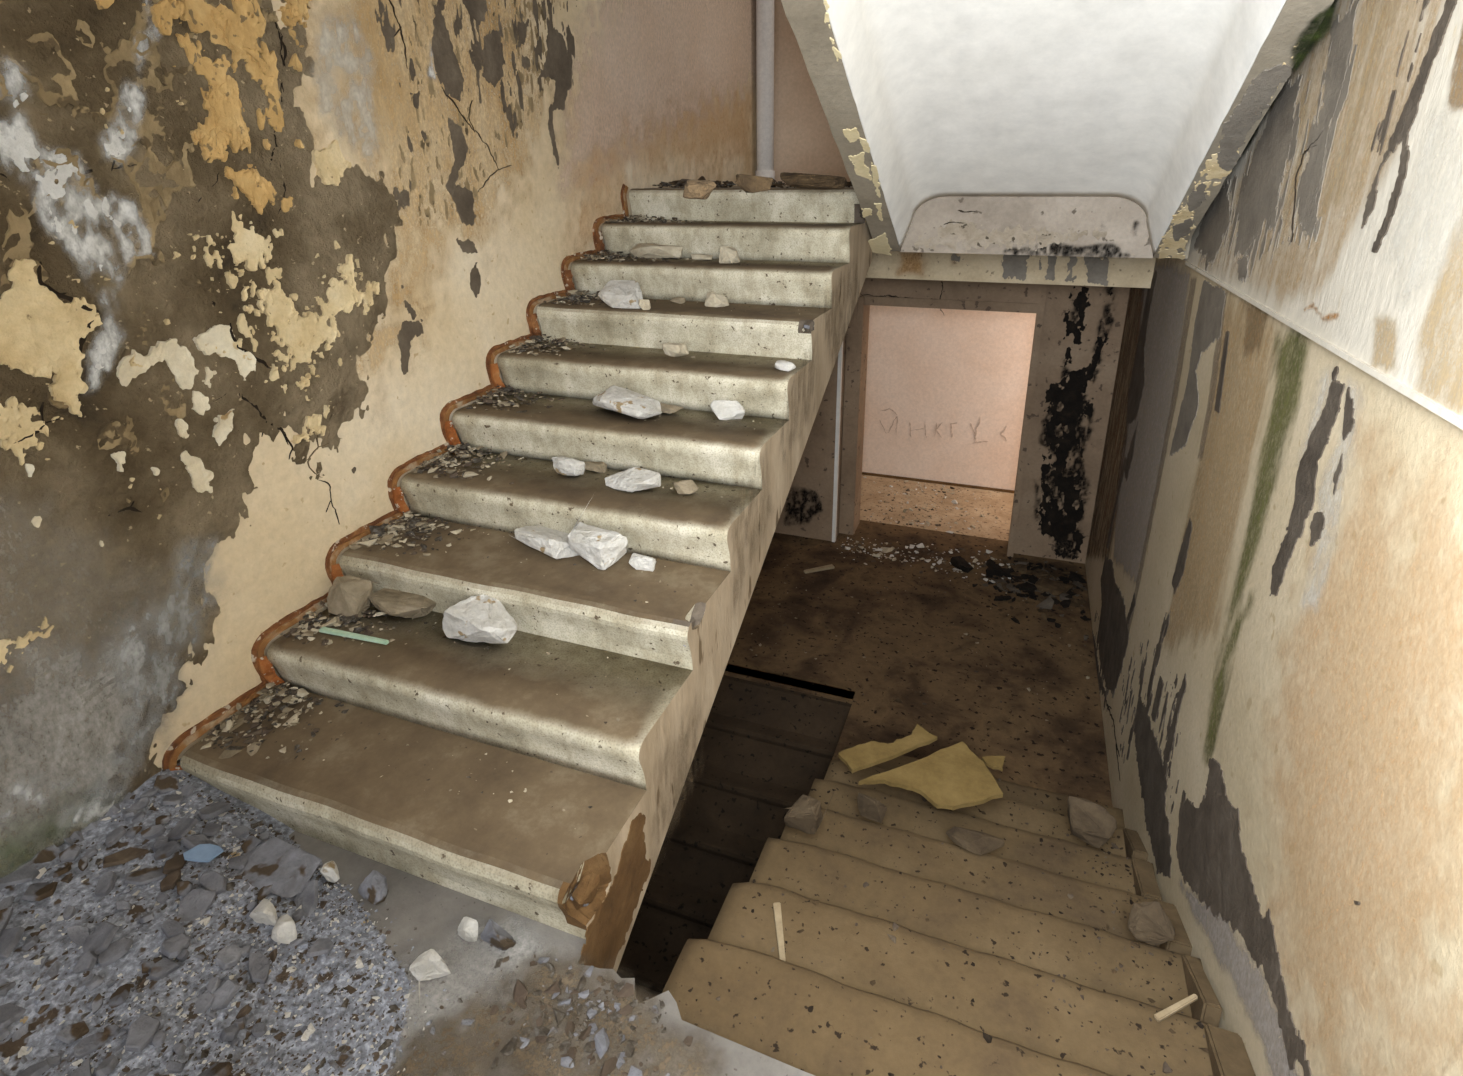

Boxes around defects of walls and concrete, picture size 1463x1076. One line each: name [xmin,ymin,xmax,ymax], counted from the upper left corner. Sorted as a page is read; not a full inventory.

efflorescence [0,62,151,281]
peeling [823,0,842,62]
peeling [843,127,892,256]
peeling [1361,0,1458,253]
efflorescence [90,301,119,388]
crack [212,301,271,369]
crack [213,393,342,525]
peeling [0,0,577,878]
peeling [914,219,1113,561]
peeling [1092,0,1360,1076]